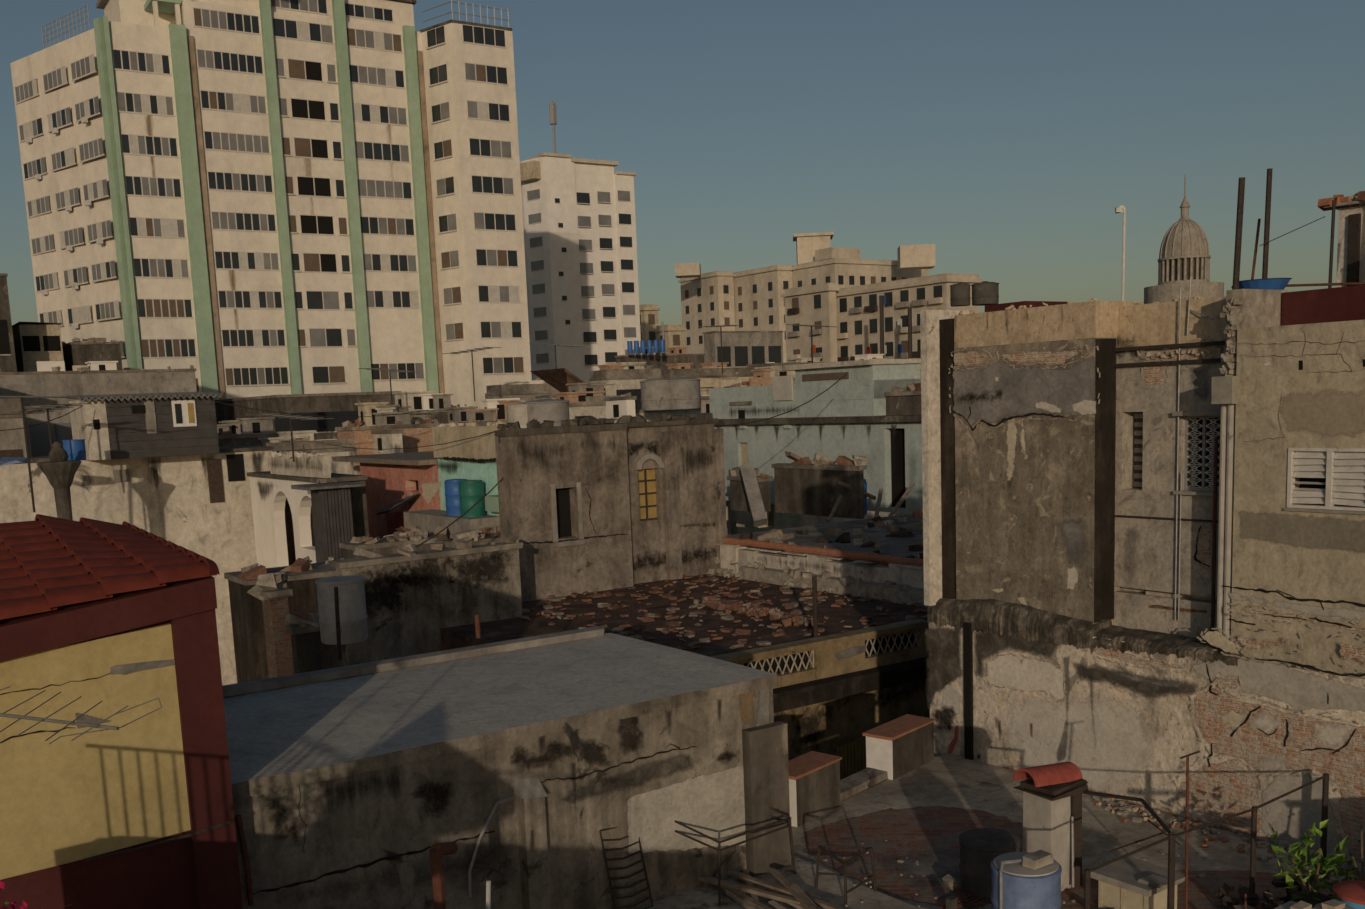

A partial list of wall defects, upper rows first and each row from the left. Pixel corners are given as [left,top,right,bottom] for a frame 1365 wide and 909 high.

flaking render [951,344,1088,381]
flaking render [1035,400,1096,437]
crack [1194,525,1365,628]
flaking render [1196,628,1248,657]
crack [1254,657,1365,704]
crack [0,727,73,743]
leakage [513,731,691,801]
leakage [619,717,642,753]
peeling [986,653,1154,795]
flaking render [1174,684,1365,864]
crack [1207,706,1356,767]
crack [253,786,495,894]